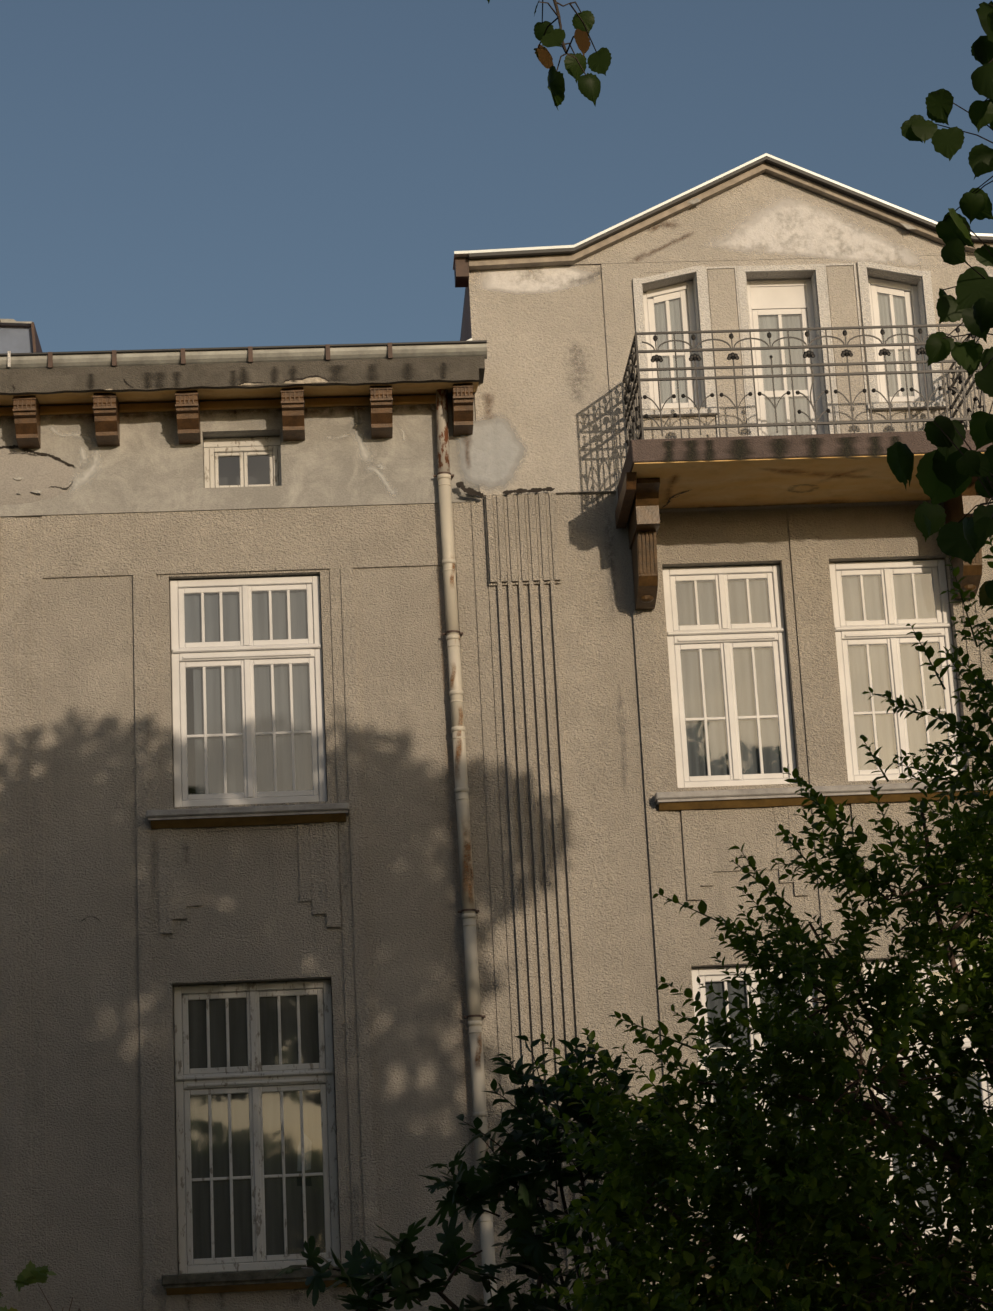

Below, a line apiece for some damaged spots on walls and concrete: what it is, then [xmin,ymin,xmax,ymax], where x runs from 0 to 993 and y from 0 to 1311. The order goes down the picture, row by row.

crack [0,445,74,489]